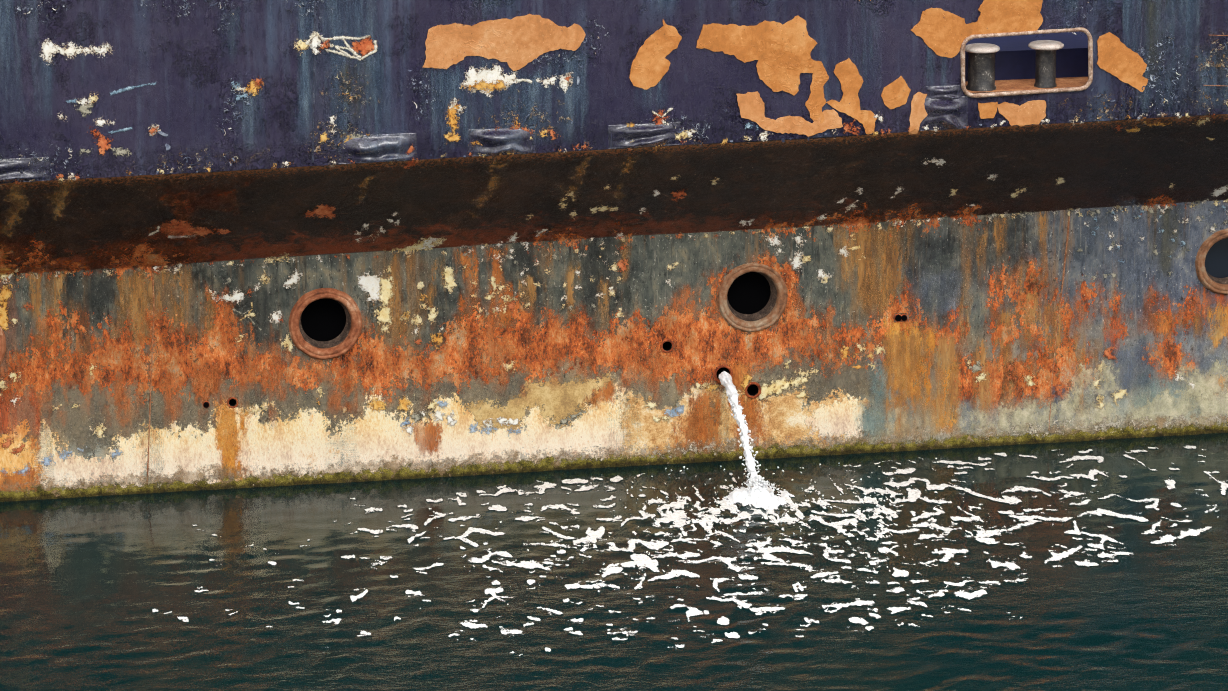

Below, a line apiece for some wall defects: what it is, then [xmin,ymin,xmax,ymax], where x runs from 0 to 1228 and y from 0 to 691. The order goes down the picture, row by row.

peeling [40,38,113,65]
peeling [286,0,380,160]
peeling [408,16,608,144]
peeling [745,122,774,142]
peeling [1062,31,1228,119]
rust [0,178,1131,479]
rust [1140,284,1228,391]